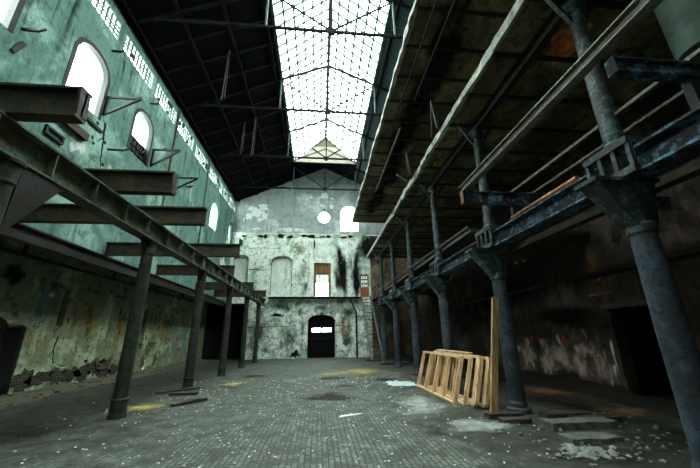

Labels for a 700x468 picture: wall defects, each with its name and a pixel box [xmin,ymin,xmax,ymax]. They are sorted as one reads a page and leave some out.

corrosion [546,29,576,66]
peeling [245,204,269,221]
damp [293,236,378,300]
damp [341,309,352,345]
crack [48,336,67,368]
flaking render [9,356,120,392]